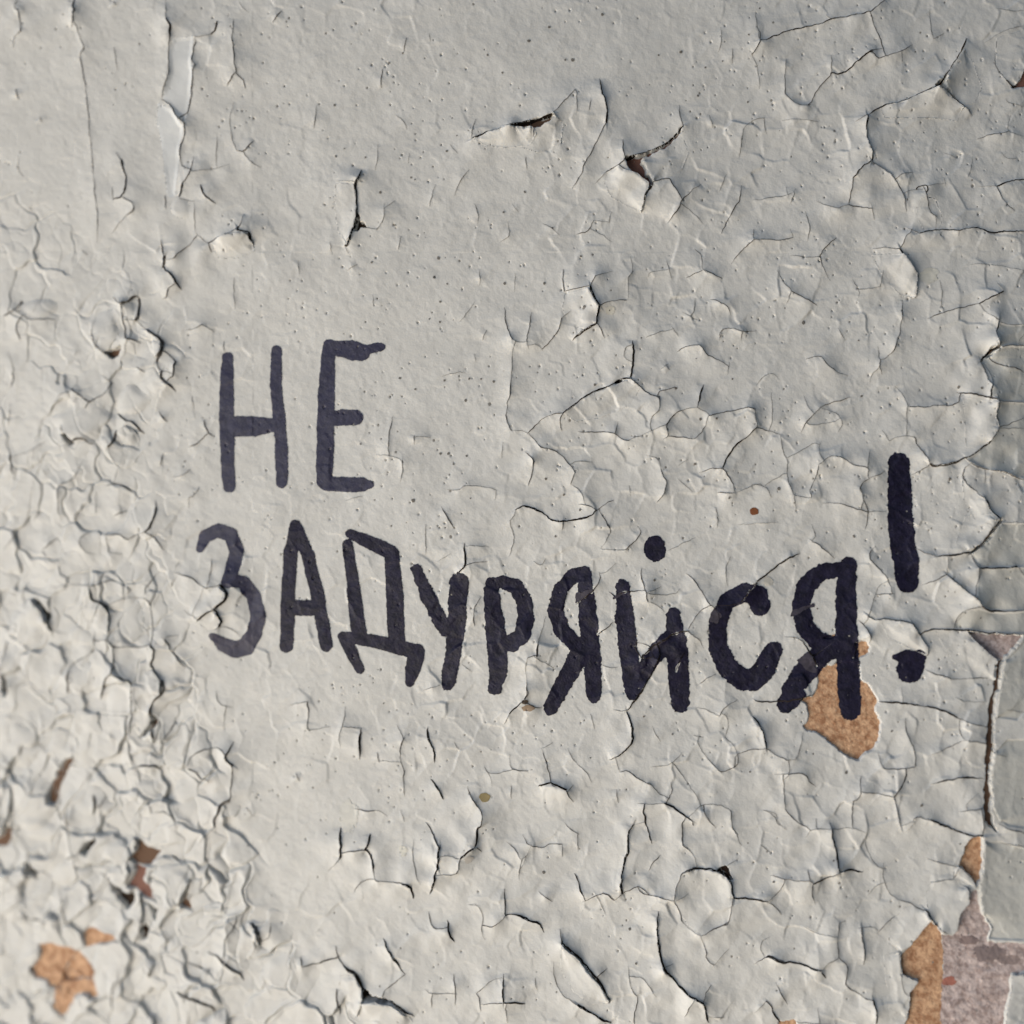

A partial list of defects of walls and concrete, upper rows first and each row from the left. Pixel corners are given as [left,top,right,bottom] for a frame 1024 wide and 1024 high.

peeling [475,116,563,153]
peeling [603,138,689,212]
crack [4,1,256,770]
crack [289,1,1024,1024]
peeling [802,664,880,759]
crack [92,794,107,815]
crack [186,742,251,843]
peeling [991,740,1024,827]
peeling [33,855,191,1015]
crack [187,915,271,995]
flaking render [883,837,1024,1024]
crack [176,992,216,1017]